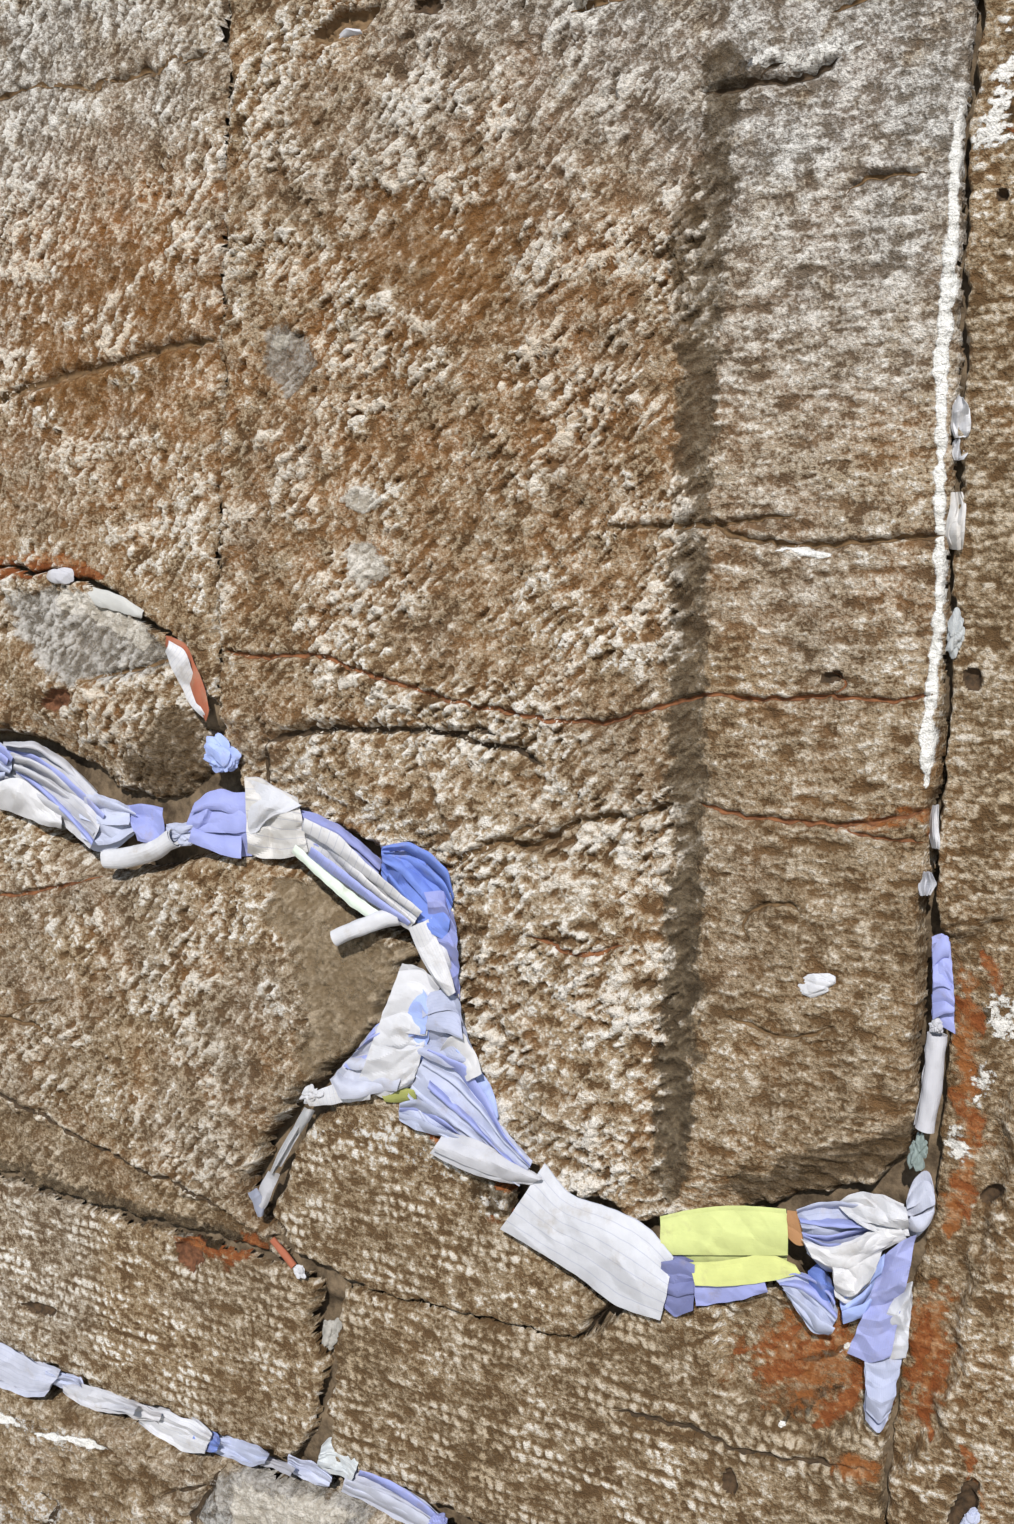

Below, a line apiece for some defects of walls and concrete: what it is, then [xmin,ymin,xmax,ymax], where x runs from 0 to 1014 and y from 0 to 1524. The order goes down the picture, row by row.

crack [831,0,867,13]
crack [701,57,839,95]
crack [0,339,219,420]
crack [73,651,933,783]
crack [452,801,932,870]
crack [612,1410,881,1470]